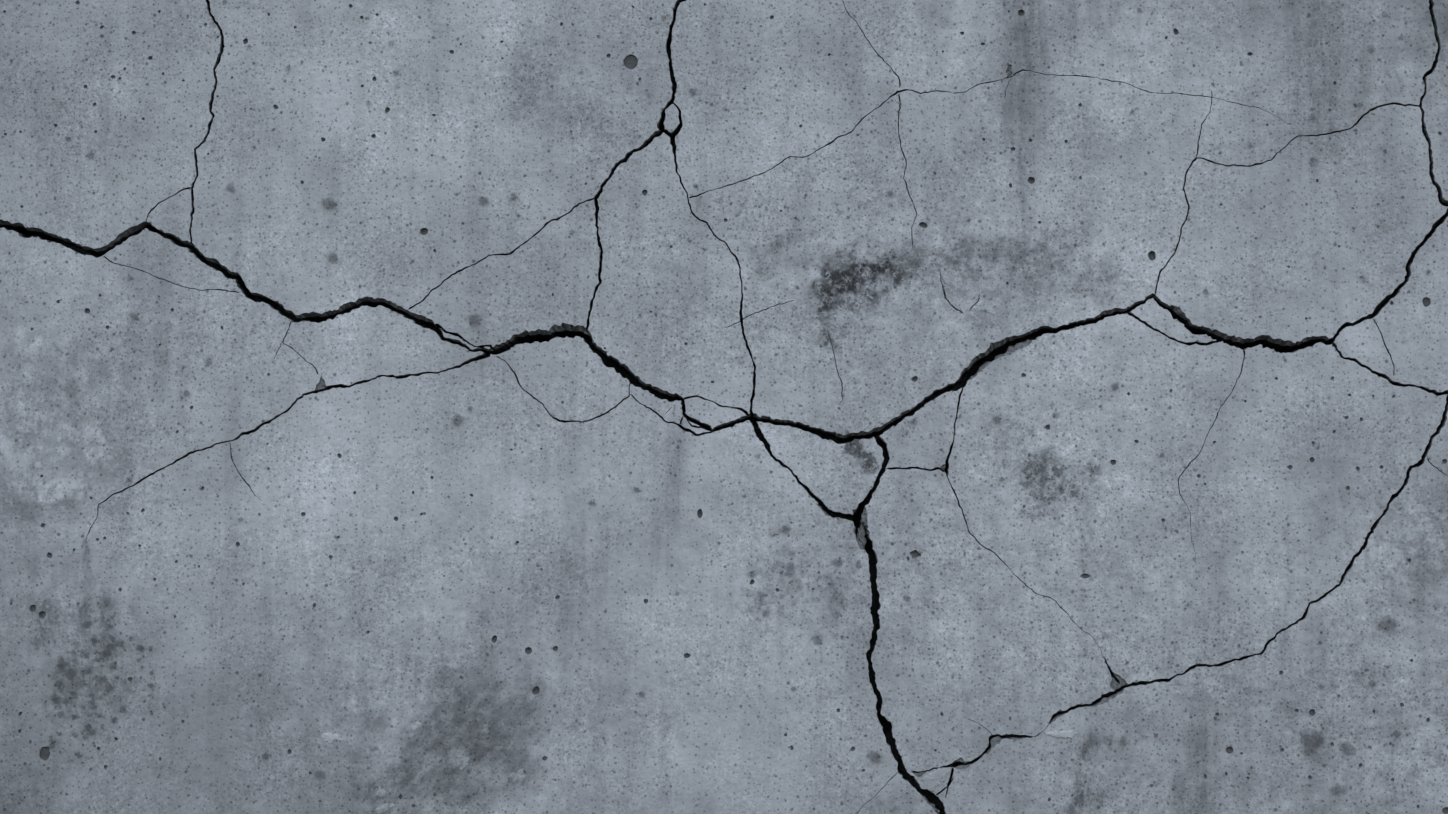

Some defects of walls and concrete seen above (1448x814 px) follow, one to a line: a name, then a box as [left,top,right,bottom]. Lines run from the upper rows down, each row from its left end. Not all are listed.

crack [0,0,1448,568]
crack [751,423,1040,814]
crack [1012,572,1091,636]
crack [1042,343,1448,732]